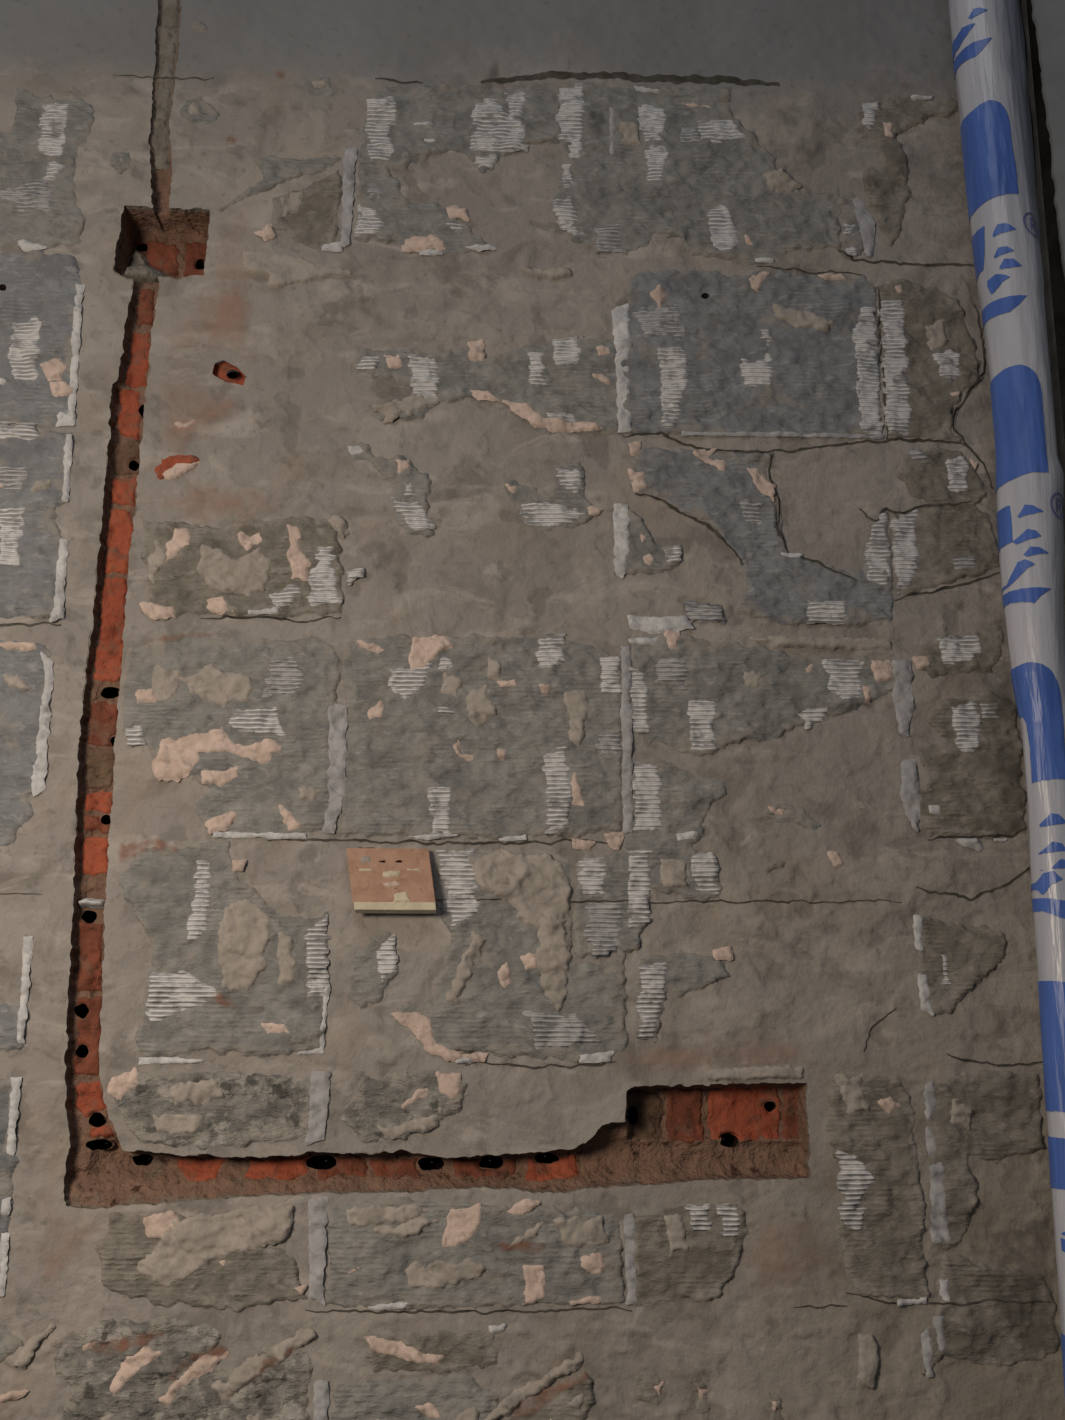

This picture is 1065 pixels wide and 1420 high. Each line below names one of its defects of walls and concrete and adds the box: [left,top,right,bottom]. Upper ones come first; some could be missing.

crack [481,71,779,86]
spalling [0,87,95,622]
crack [622,249,993,581]
spalling [85,82,1027,1170]
spalling [0,640,54,846]
spalling [0,936,34,1052]
spalling [74,1003,89,1019]
spalling [81,910,97,924]
crack [569,828,1029,904]
spalling [0,1077,22,1297]
spalling [52,1197,749,1420]
spalling [825,1070,1060,1378]